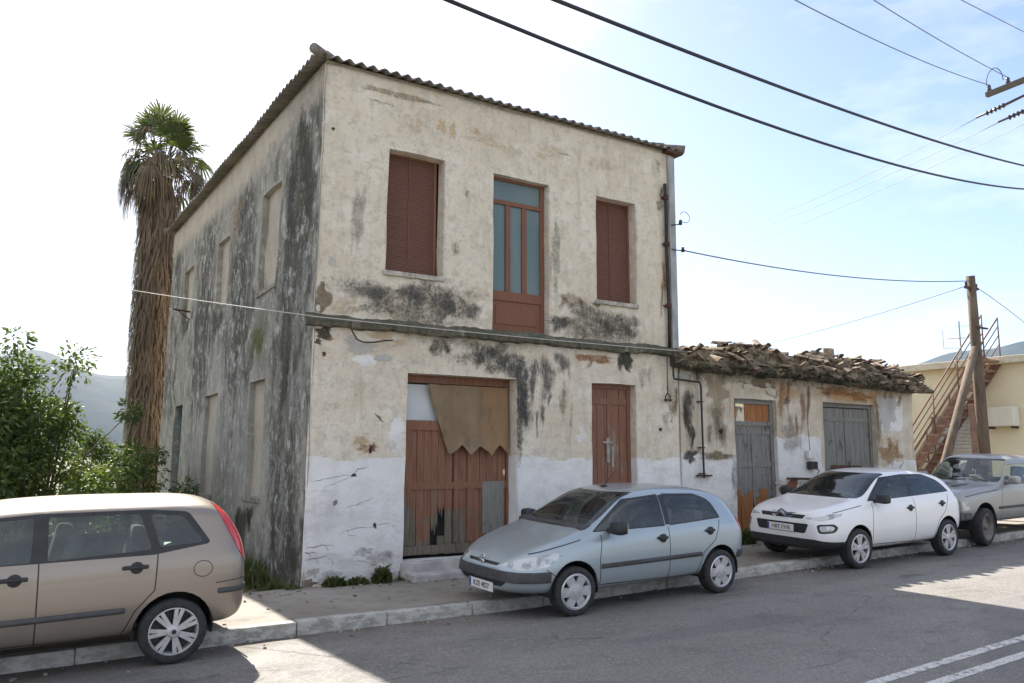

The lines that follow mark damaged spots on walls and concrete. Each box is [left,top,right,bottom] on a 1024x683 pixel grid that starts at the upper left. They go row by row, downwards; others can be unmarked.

water stain [287,111,314,239]
water stain [277,322,305,412]
spalling [315,282,333,313]
water stain [350,282,480,326]
water stain [463,342,569,456]
water stain [545,297,637,372]
water stain [669,388,732,463]
spalling [670,339,934,432]
water stain [235,507,253,548]
crack [305,498,395,565]